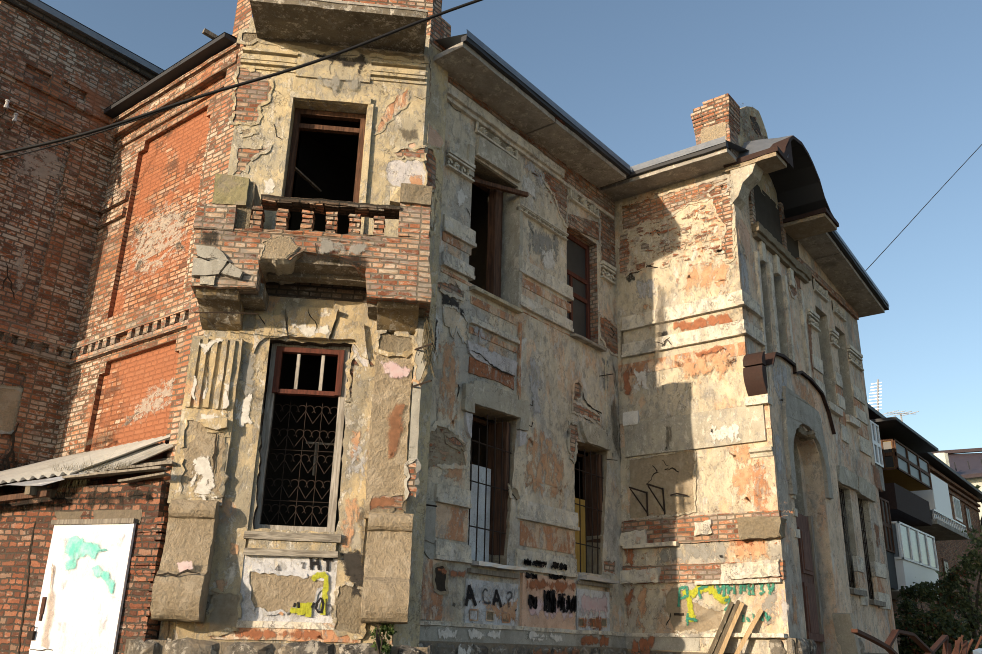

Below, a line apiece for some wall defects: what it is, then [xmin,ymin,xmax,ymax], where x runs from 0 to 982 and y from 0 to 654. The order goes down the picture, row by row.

spalling [229,66,274,174]
peeling [374,87,410,135]
peeling [384,123,444,237]
spalling [598,176,752,294]
peeling [199,338,223,354]
peeling [675,346,735,380]
spalling [177,383,253,499]
spalling [205,279,527,641]
peeling [724,540,780,561]